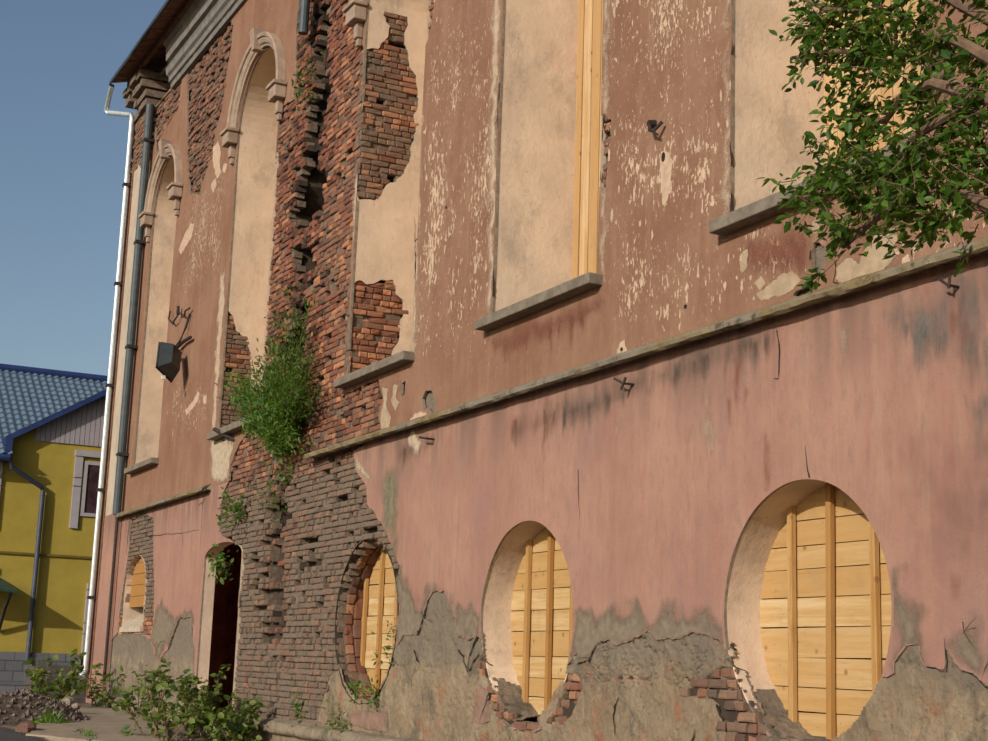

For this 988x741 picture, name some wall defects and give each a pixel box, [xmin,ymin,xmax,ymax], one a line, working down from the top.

peeling [600,0,923,354]
flaking render [130,0,800,741]
flaking render [107,513,195,704]
crack [920,617,988,689]